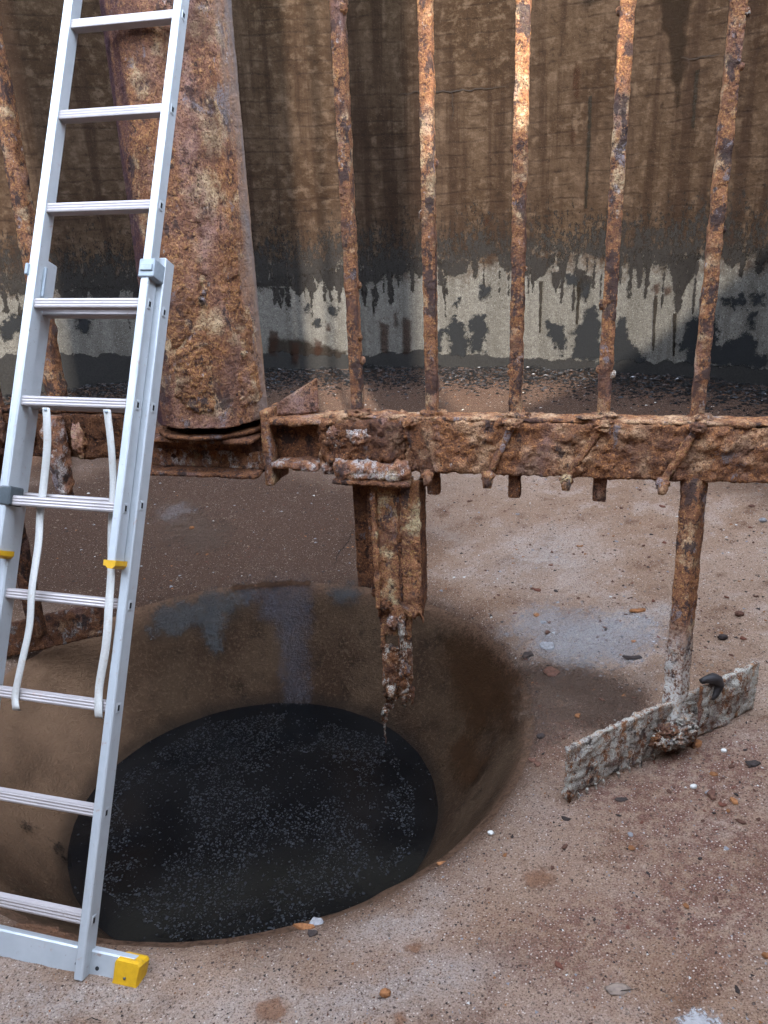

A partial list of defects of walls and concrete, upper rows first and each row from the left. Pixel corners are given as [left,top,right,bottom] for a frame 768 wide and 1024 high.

water stain [0,220,27,397]
water stain [49,215,139,298]
water stain [60,353,132,390]
water stain [252,208,344,328]
water stain [263,338,349,372]
water stain [356,200,423,314]
water stain [363,349,425,368]
water stain [436,196,512,368]
water stain [523,96,608,372]
water stain [613,187,710,379]
water stain [709,291,768,386]
water stain [722,174,768,278]